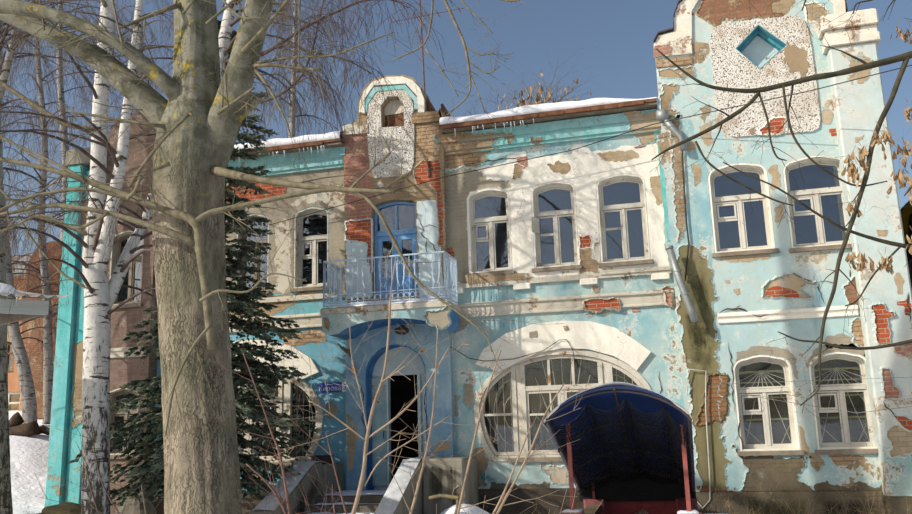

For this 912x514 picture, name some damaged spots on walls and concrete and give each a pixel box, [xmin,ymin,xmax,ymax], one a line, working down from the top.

flaking render [692,0,829,27]
peeling [547,160,571,175]
peeling [412,123,530,285]
peeling [226,135,384,318]
peeling [578,234,601,275]
peeling [597,42,883,493]
spalling [423,304,472,334]
flaking render [582,285,641,319]
flaking render [810,269,912,362]
flaking render [878,366,902,401]
peeling [884,413,912,459]
peeling [472,445,569,489]